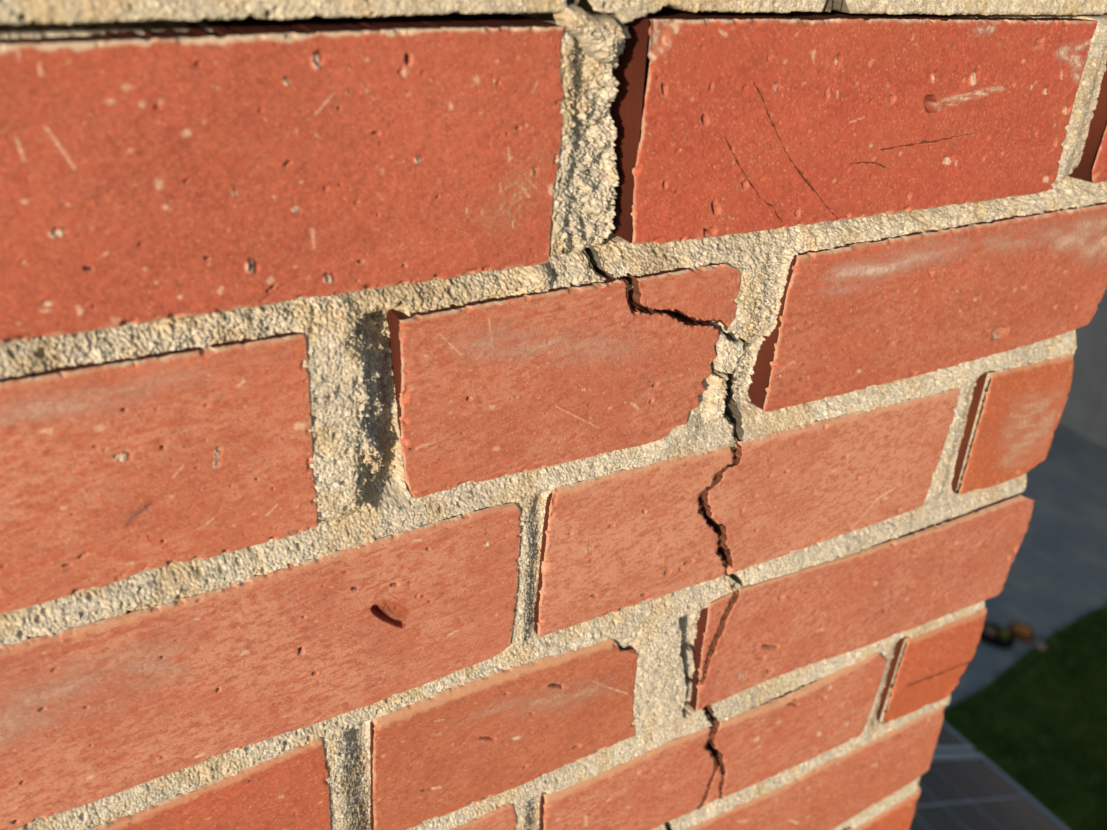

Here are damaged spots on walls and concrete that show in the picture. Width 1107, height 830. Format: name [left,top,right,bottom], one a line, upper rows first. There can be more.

crack [566,0,579,8]
crack [582,238,745,343]
crack [683,364,744,810]